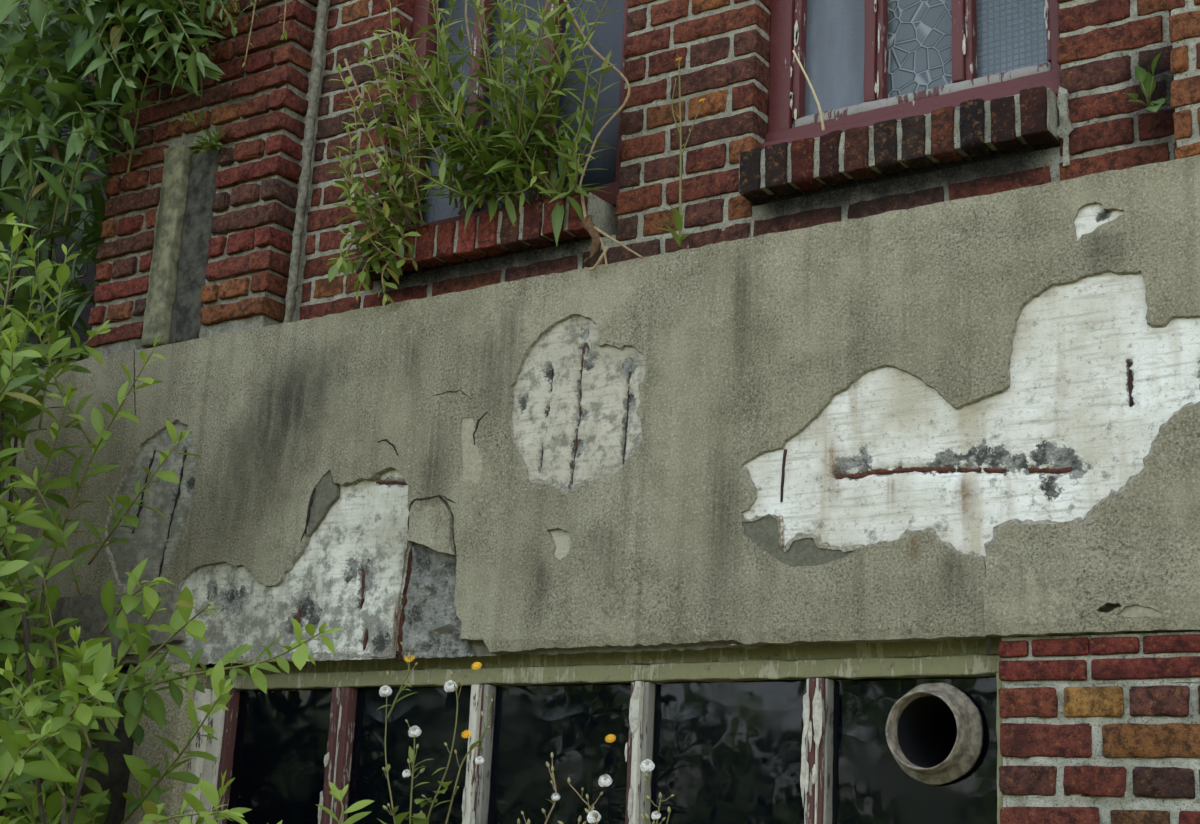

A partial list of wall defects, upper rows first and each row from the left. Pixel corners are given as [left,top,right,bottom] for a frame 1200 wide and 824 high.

spalling [1074,203,1124,241]
spalling [509,314,645,494]
spalling [741,270,1200,567]
spalling [158,468,497,665]
spalling [550,529,571,560]